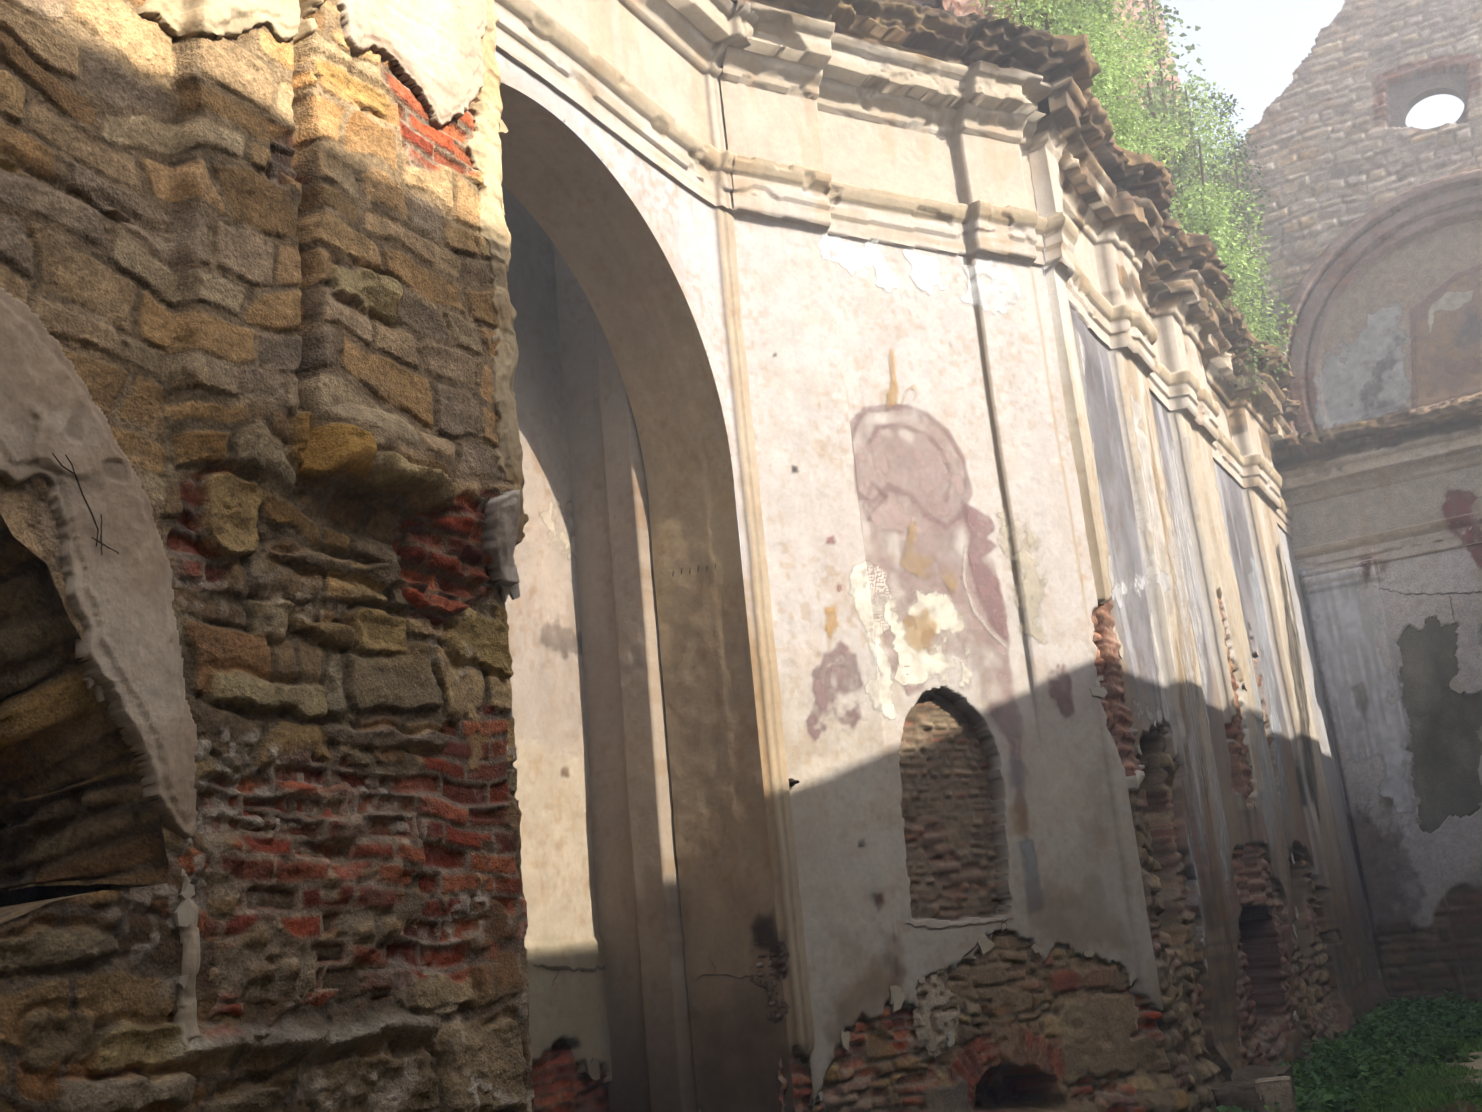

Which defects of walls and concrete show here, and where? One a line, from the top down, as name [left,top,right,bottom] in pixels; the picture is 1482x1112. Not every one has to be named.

flaking render [1313,303,1412,430]
flaking render [1428,290,1474,333]
flaking render [0,287,426,1047]
spalling [1216,591,1275,809]
flaking render [1396,617,1482,833]
spalling [778,561,1225,1112]
spalling [531,1042,609,1112]